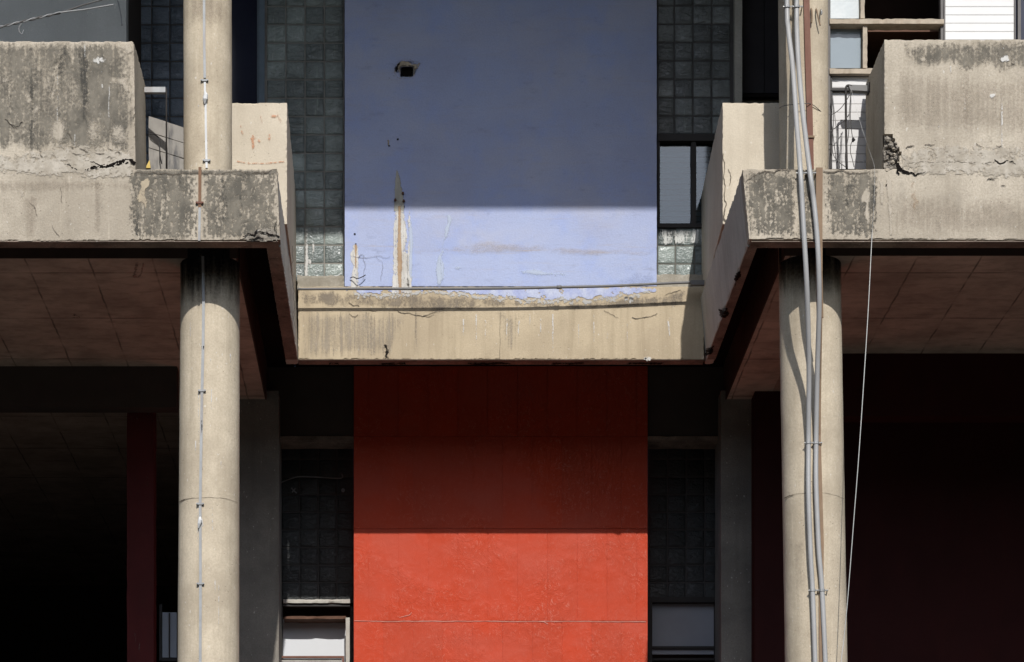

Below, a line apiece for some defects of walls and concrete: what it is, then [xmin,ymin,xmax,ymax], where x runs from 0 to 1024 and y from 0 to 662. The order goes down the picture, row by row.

leakage [0,43,132,150]
crack [16,132,279,202]
spalling [884,134,1024,186]
leakage [129,169,277,239]
leakage [746,171,877,237]
crack [243,222,296,328]
leakage [304,171,519,358]
peeling [346,287,656,305]
leakage [597,294,683,307]